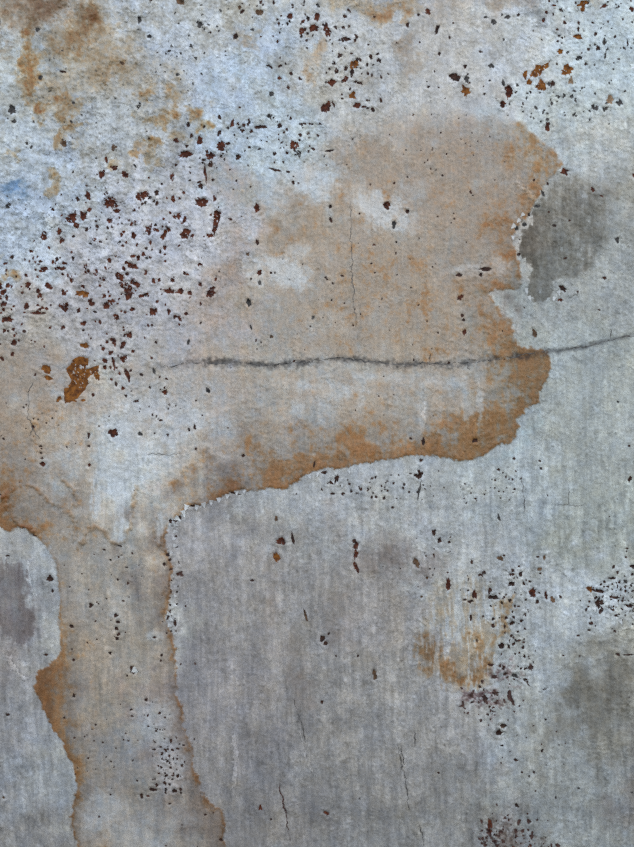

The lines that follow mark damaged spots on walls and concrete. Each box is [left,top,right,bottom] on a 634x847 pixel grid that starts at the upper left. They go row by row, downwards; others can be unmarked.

corrosion [0,0,217,173]
corrosion [230,26,265,55]
corrosion [321,0,543,80]
crack [155,203,634,372]
water stain [500,164,634,319]
corrosion [0,97,565,847]